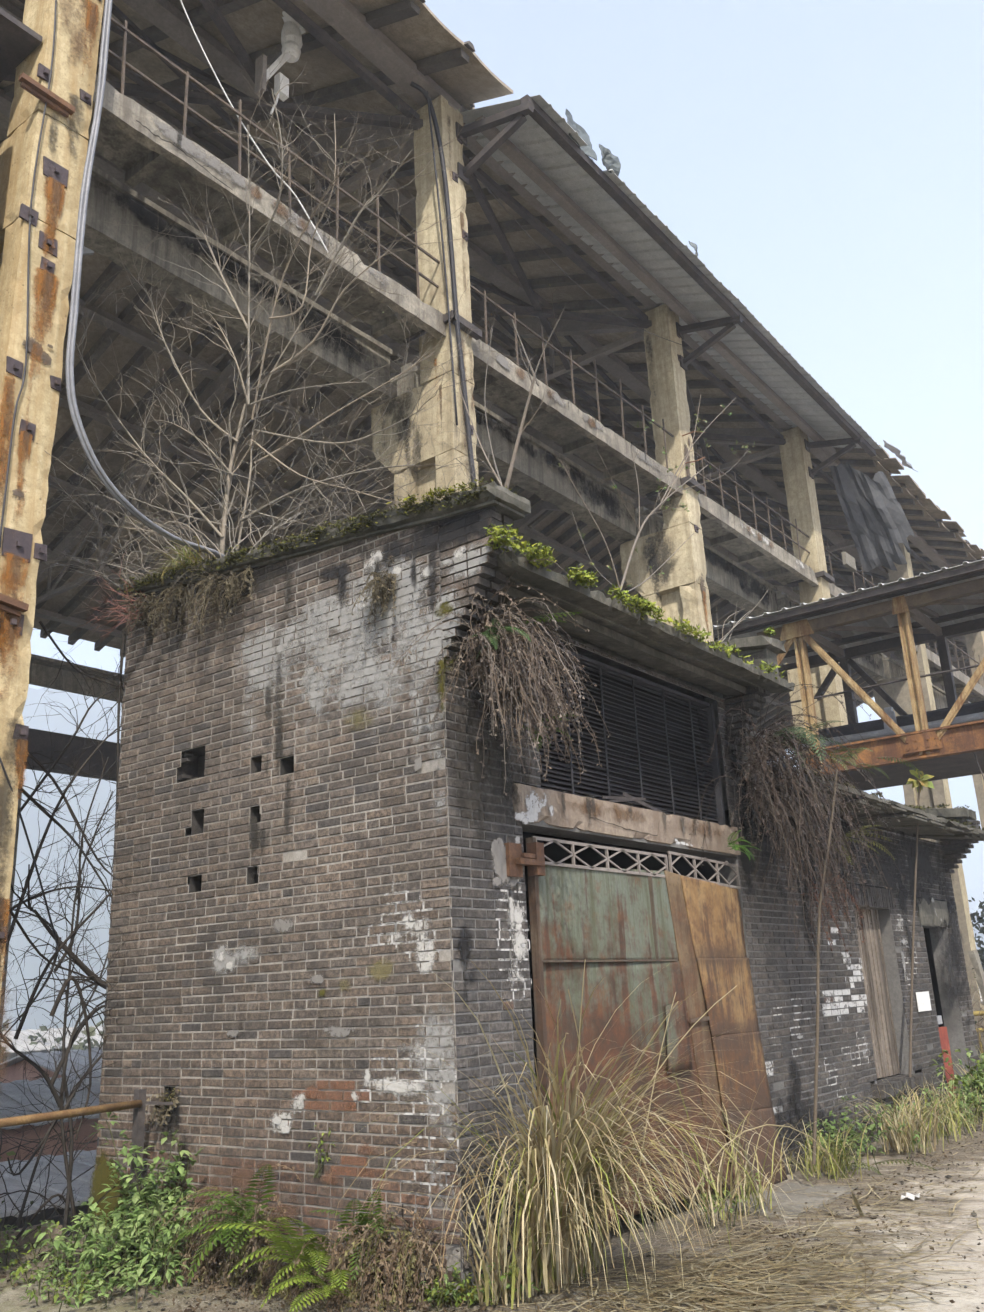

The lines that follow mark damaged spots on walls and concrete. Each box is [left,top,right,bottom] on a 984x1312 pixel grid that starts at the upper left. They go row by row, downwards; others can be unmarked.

corrosion [85,0,98,51]
corrosion [0,177,65,514]
damp [133,542,529,835]
flaking render [515,791,554,825]